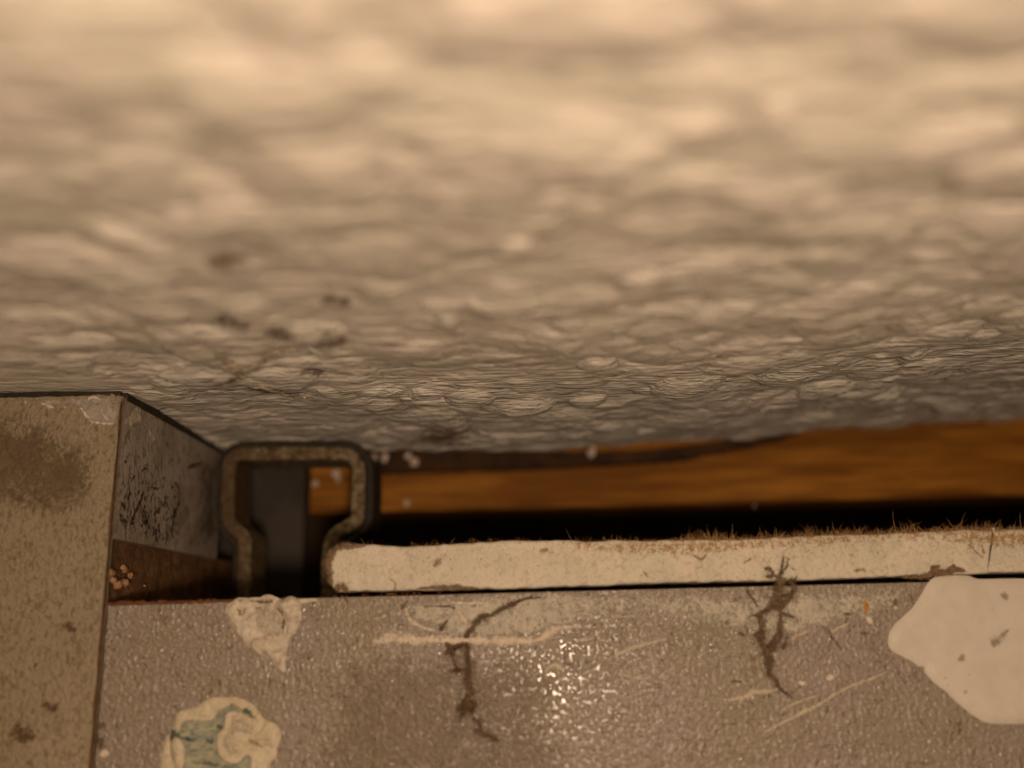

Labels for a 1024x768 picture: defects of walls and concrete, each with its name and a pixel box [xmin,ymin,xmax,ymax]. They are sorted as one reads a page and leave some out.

peeling [225,595,318,672]
crack [401,591,544,742]
peeling [160,697,282,768]